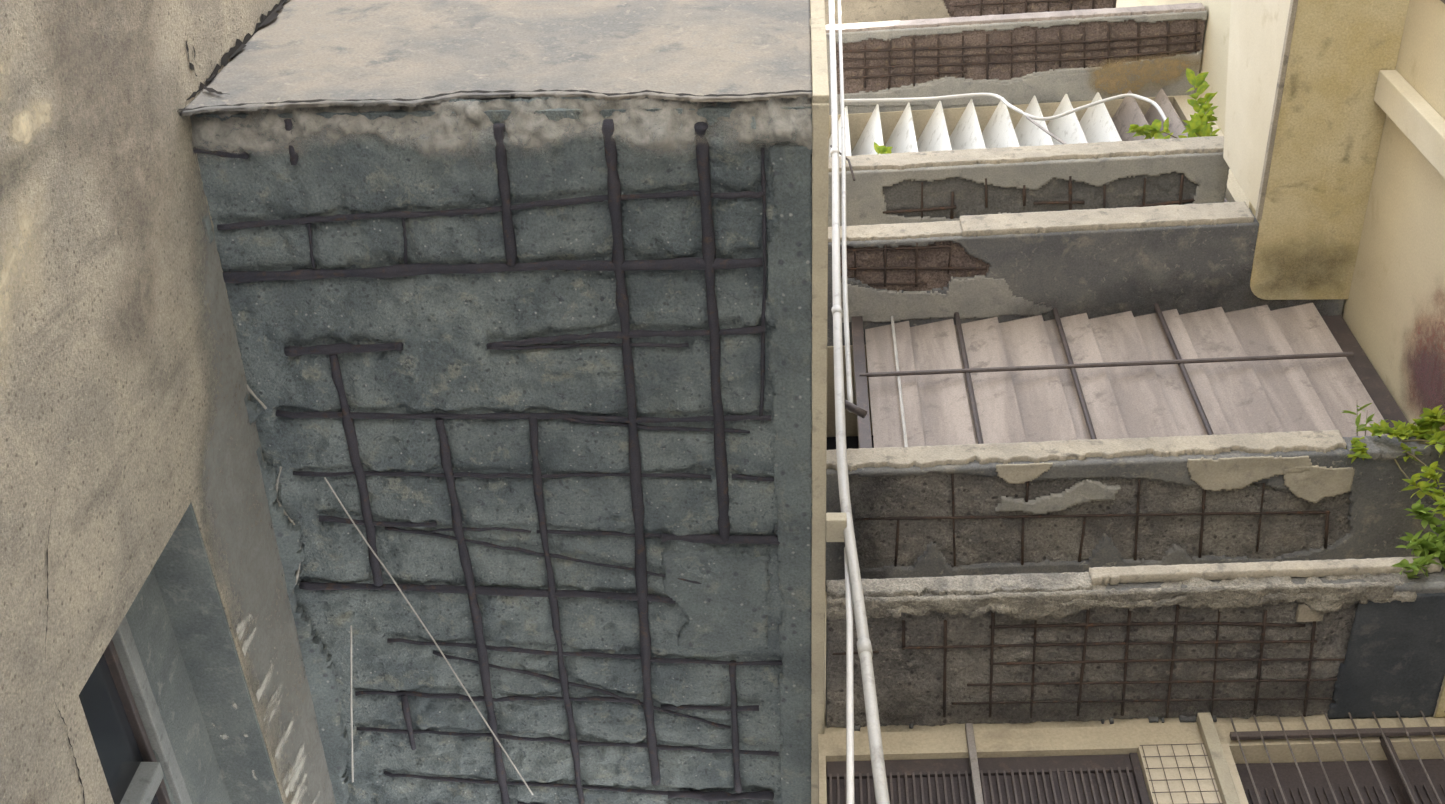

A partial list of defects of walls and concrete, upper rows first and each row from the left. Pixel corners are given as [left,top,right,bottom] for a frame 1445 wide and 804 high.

spalling [836,0,1205,94]
spalling [883,171,1199,219]
spalling [840,238,989,292]
spalling [191,96,812,804]
spalling [826,456,1417,728]
crack [53,694,85,804]